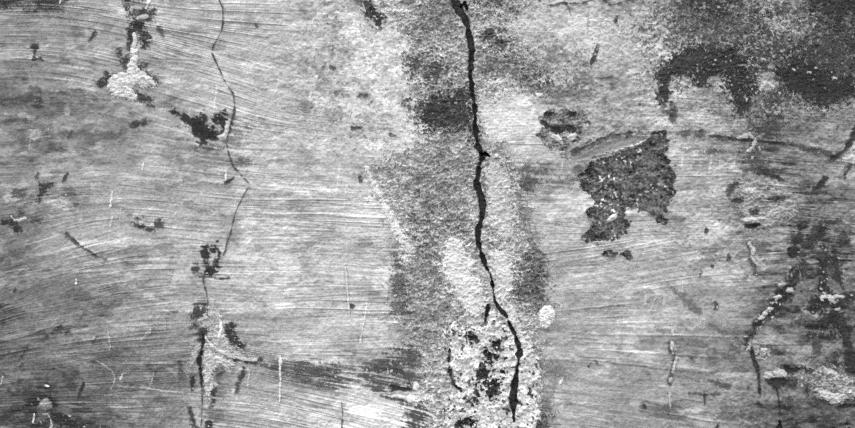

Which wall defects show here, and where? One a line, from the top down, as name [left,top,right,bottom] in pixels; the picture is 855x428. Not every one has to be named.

crack [211,0,248,256]
crack [451,0,523,422]
spalling [536,107,677,260]
damp [632,0,763,126]
damp [704,135,832,157]
damp [773,0,855,115]
crack [196,276,208,426]
crack [447,349,462,392]